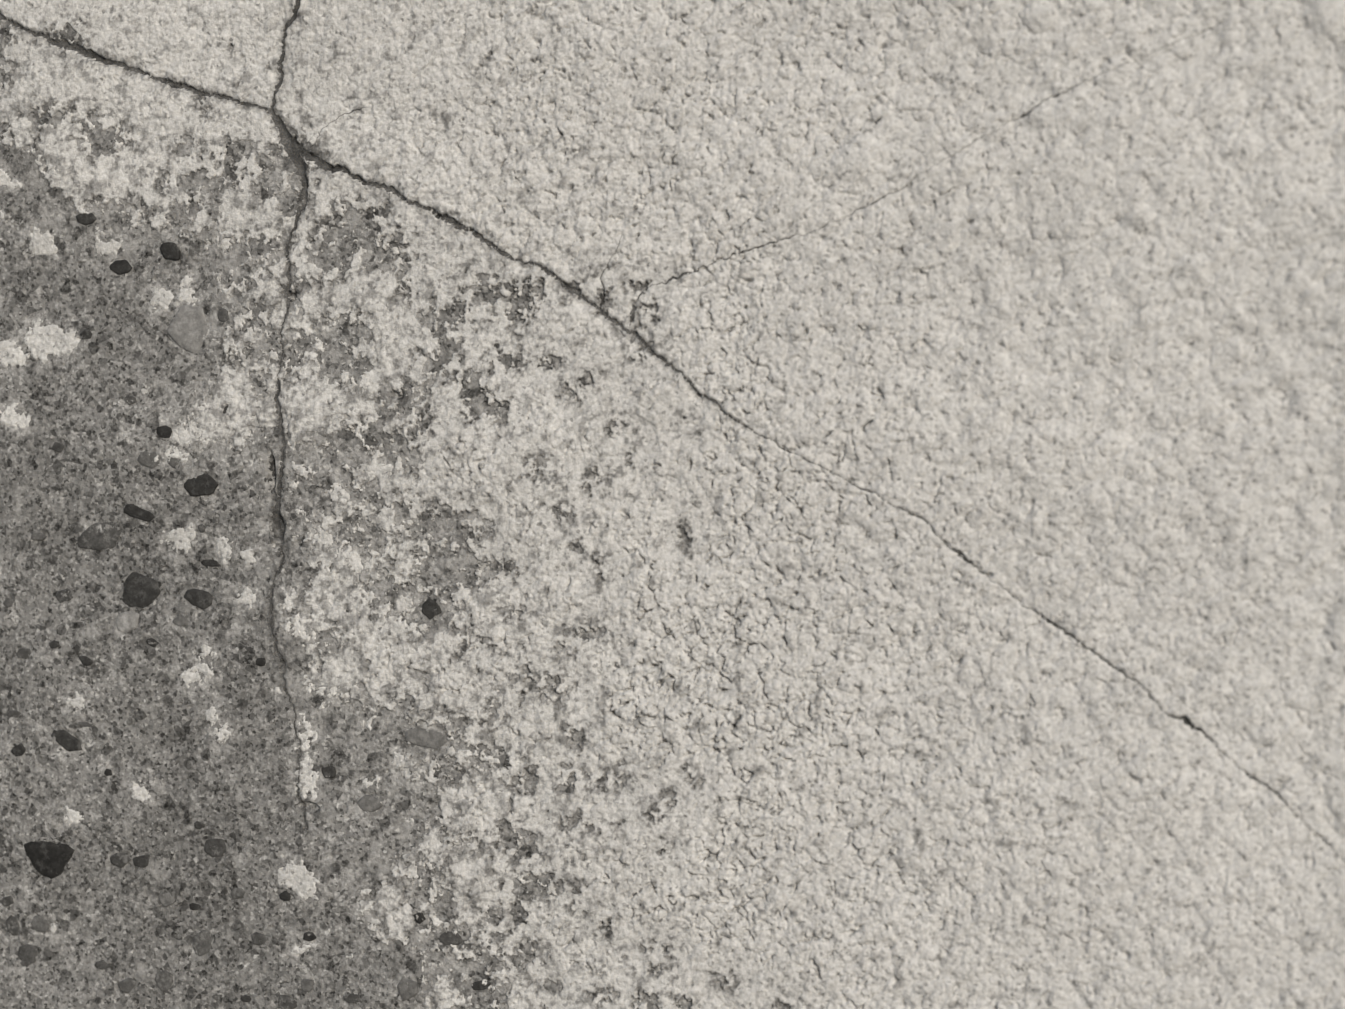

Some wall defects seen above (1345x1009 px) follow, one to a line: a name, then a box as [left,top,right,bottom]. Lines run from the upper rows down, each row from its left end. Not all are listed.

peeling [0,18,85,89]
crack [932,20,1225,167]
crack [838,172,923,221]
crack [629,223,828,327]
crack [0,0,753,771]
peeling [0,97,661,1009]
peeling [676,519,692,559]
crack [754,432,1345,861]
crack [296,776,308,837]
peeling [644,763,705,821]
peeling [586,939,692,1009]
peeling [710,970,738,994]